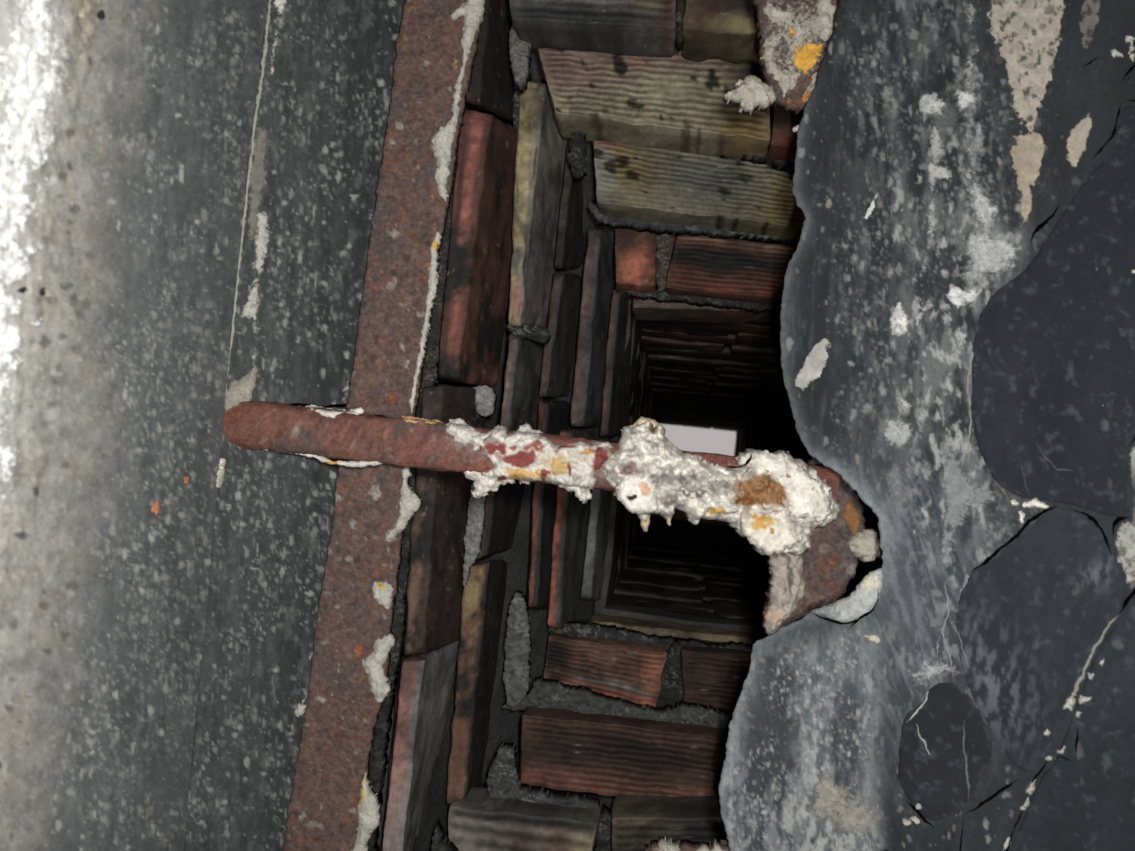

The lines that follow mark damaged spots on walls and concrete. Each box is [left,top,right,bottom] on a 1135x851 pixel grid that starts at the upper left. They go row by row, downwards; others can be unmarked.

corrosion [789,26,823,74]
peeling [1079,0,1100,50]
peeling [987,0,1066,224]
crack [1031,205,1060,242]
damp [0,0,101,512]
peeling [795,338,830,390]
peeling [898,106,1135,851]
corrosion [843,499,860,535]
crack [971,505,1130,573]
flaking render [815,568,883,622]
crack [906,800,933,826]
crack [960,728,1079,851]